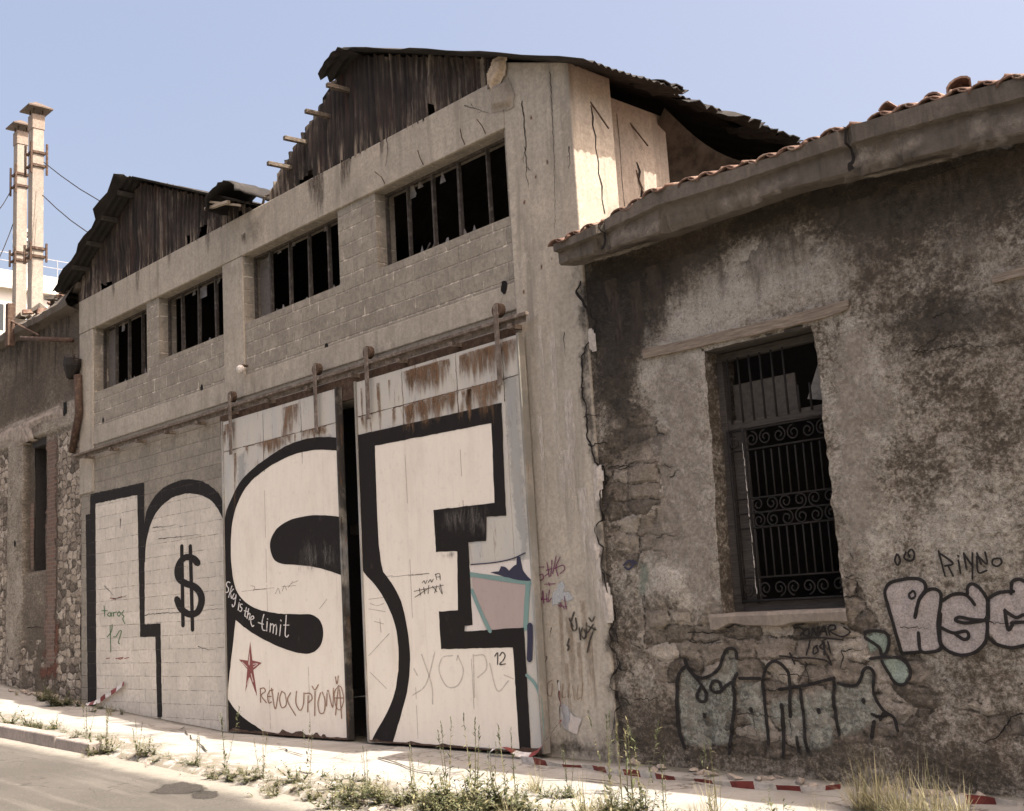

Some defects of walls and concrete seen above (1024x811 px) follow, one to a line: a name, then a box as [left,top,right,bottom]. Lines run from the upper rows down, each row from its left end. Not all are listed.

crack [521,71,570,228]
crack [590,102,649,250]
crack [844,127,855,172]
flaking render [582,286,597,352]
rust [376,339,516,428]
rust [234,404,326,482]
flaking render [589,537,602,566]
flaking render [593,464,604,509]
crack [563,281,675,744]
flaking render [600,583,614,623]